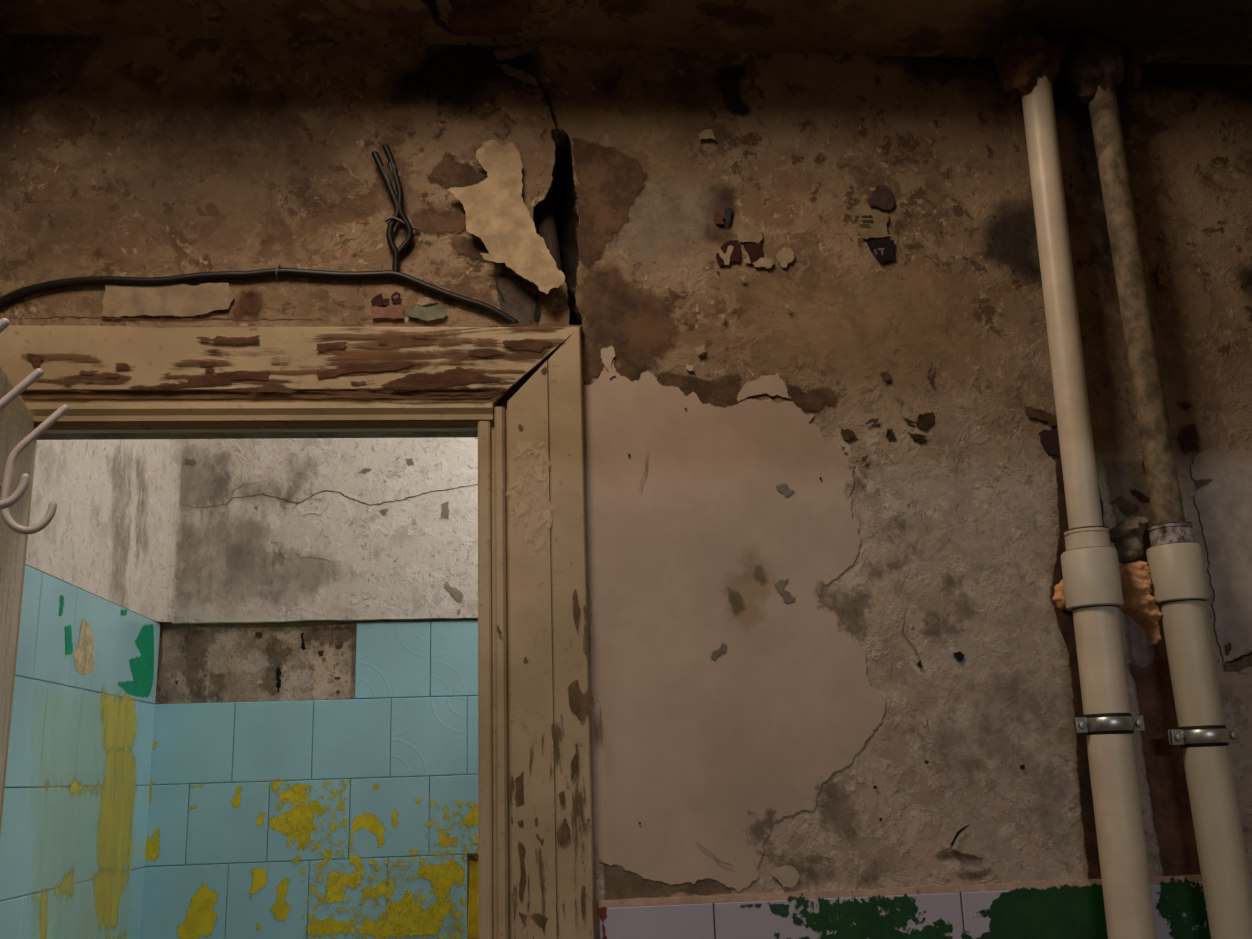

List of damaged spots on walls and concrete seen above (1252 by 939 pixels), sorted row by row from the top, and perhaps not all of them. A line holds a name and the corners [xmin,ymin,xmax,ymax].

damp [394,44,536,107]
crack [427,0,559,136]
crack [495,276,540,322]
crack [182,482,478,563]
peeling [21,129,934,939]
damp [750,810,833,885]
damp [938,851,991,879]